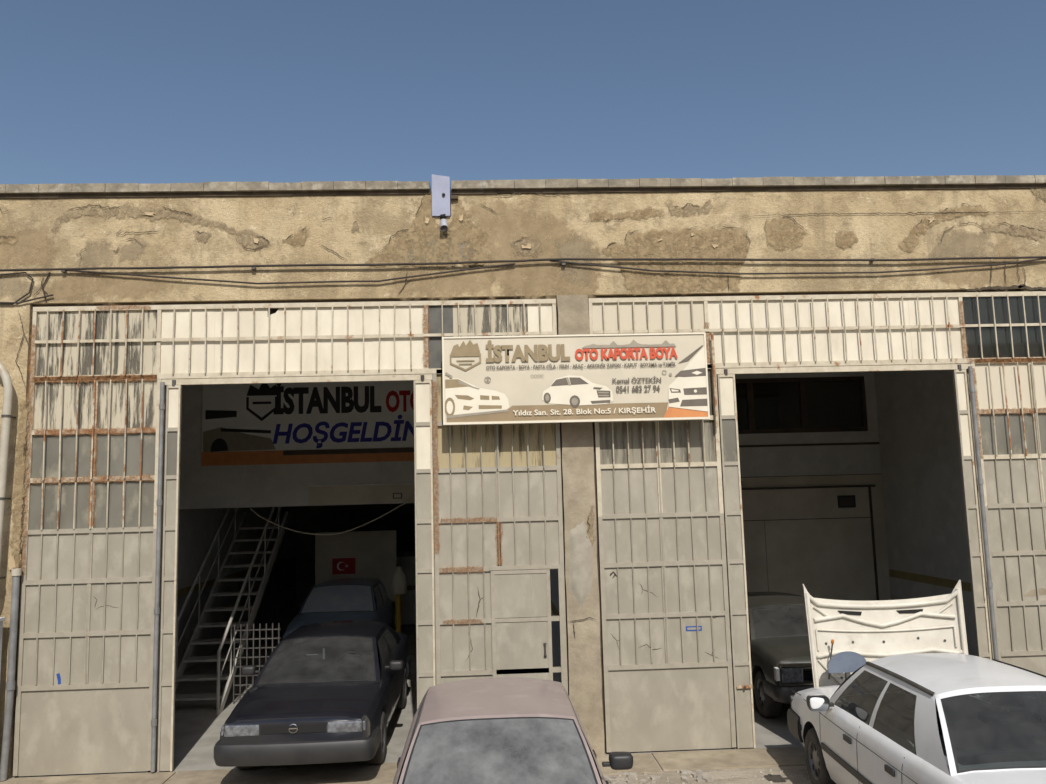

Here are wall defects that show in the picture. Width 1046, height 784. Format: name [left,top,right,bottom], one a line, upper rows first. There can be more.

flaking render [49,203,269,250]
flaking render [282,228,307,246]
flaking render [589,199,751,295]
flaking render [764,215,807,251]
flaking render [836,231,859,248]
flaking render [899,203,1046,252]
corrosion [21,325,156,575]
crack [569,617,661,650]